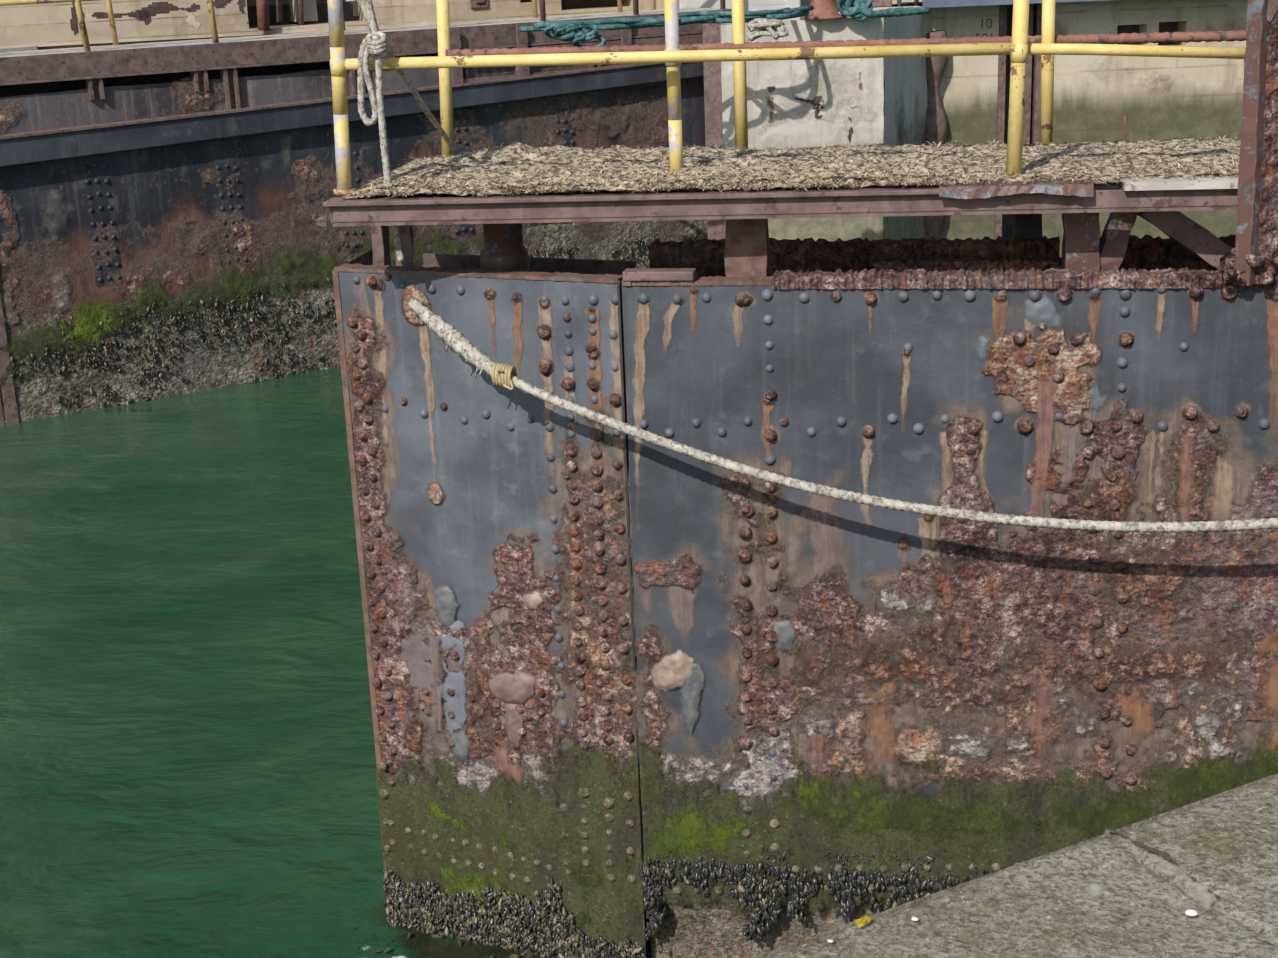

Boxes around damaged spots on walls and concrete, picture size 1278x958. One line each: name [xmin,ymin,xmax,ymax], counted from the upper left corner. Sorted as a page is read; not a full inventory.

rust [409,90,669,161]
rust [0,155,372,343]
rust [412,224,484,245]
rust [569,222,609,246]
rust [483,288,496,346]
rust [511,293,523,369]
rust [346,275,438,779]
rust [427,482,445,506]
rust [537,284,1278,809]
rust [494,744,521,806]